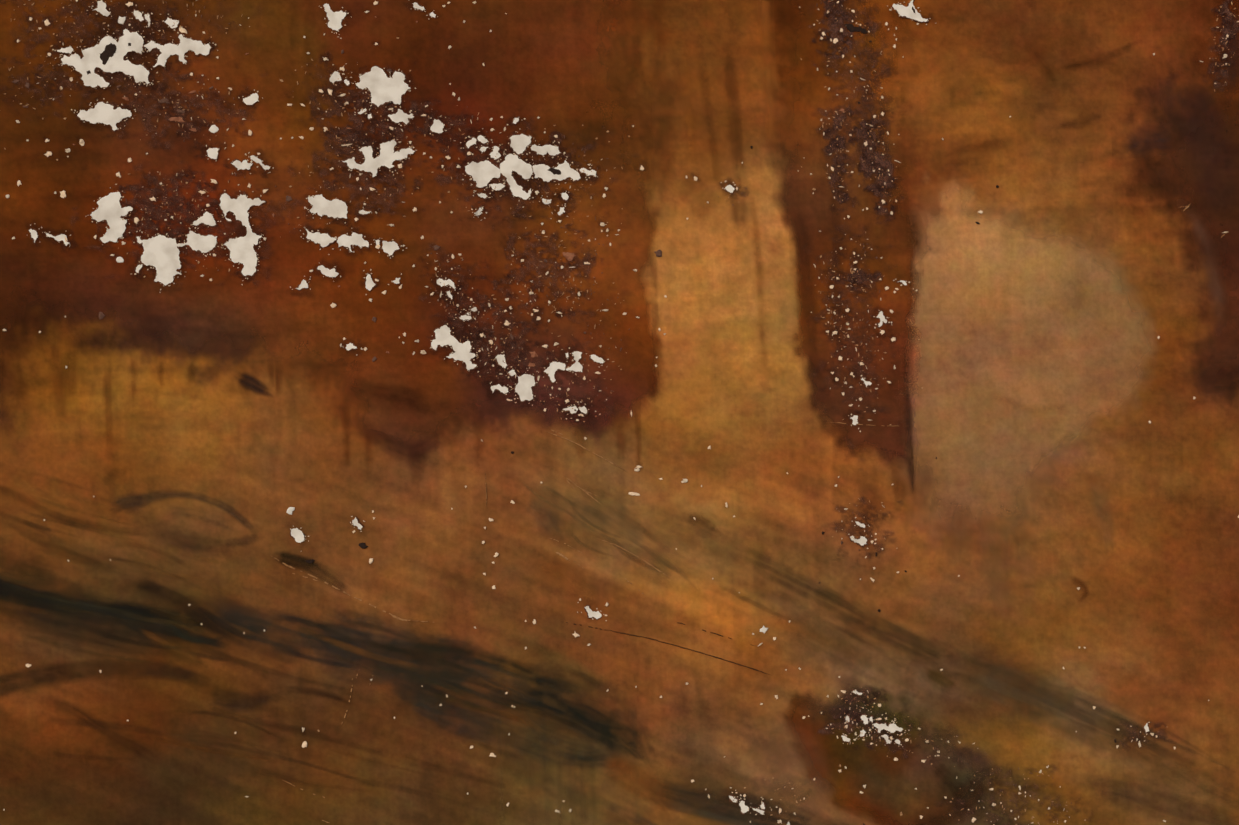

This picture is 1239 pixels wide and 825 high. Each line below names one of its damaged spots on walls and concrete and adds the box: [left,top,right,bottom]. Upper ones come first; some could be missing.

peeling [5,0,640,422]
corrosion [0,0,660,456]
corrosion [775,0,919,469]
damp [911,189,1153,535]
corrosion [1134,0,1239,396]
peeling [1200,2,1239,91]
peeling [822,498,898,582]
peeling [729,778,805,825]
peeling [802,676,1072,825]